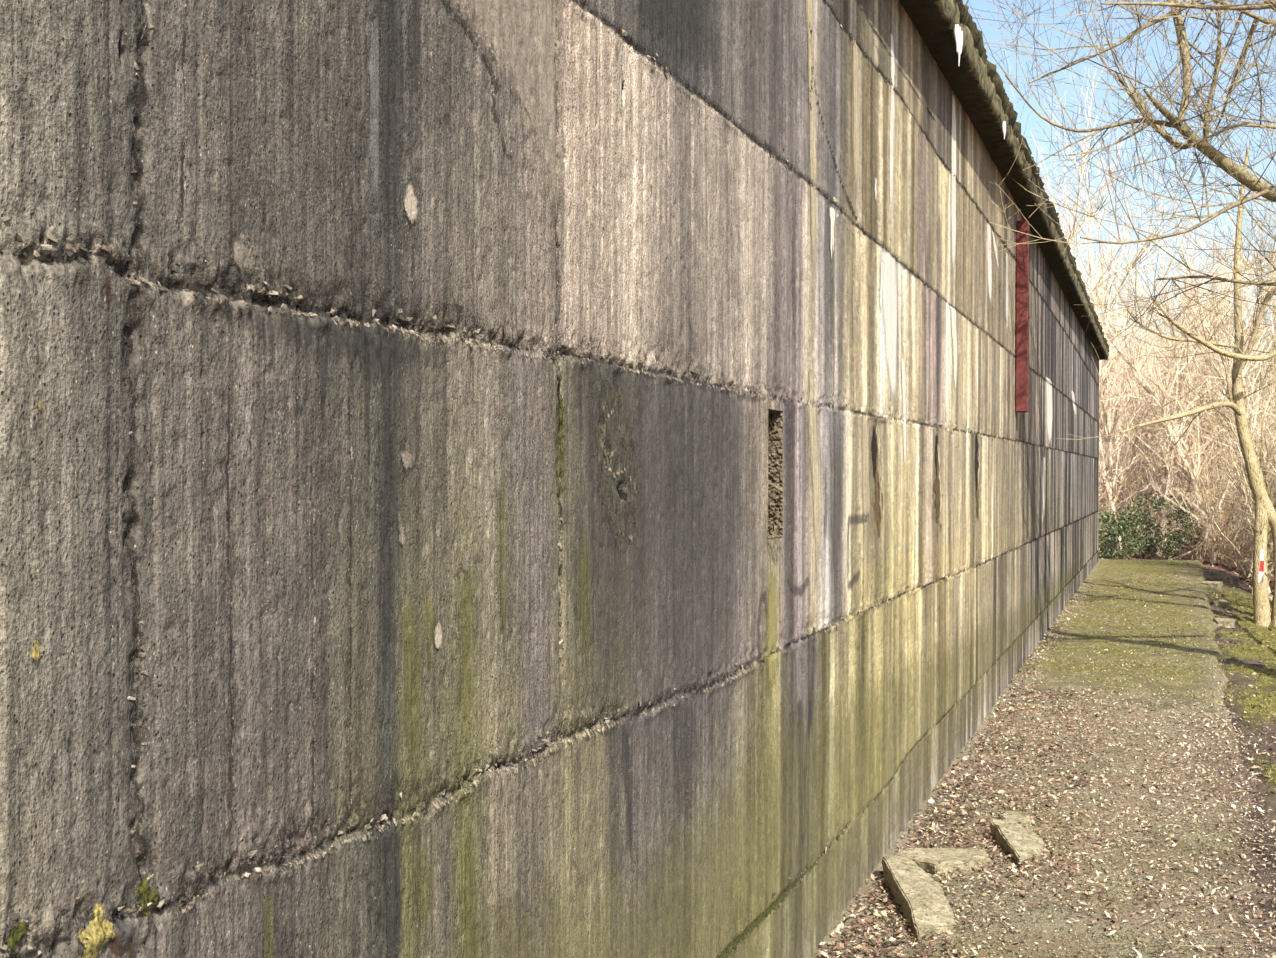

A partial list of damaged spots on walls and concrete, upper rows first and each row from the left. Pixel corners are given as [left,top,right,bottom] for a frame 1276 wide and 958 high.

water stain [875,34,895,216]
water stain [829,206,839,257]
water stain [879,251,906,460]
water stain [987,223,1009,330]
water stain [251,304,412,670]
water stain [426,589,434,662]
water stain [623,731,632,847]
water stain [798,699,812,886]